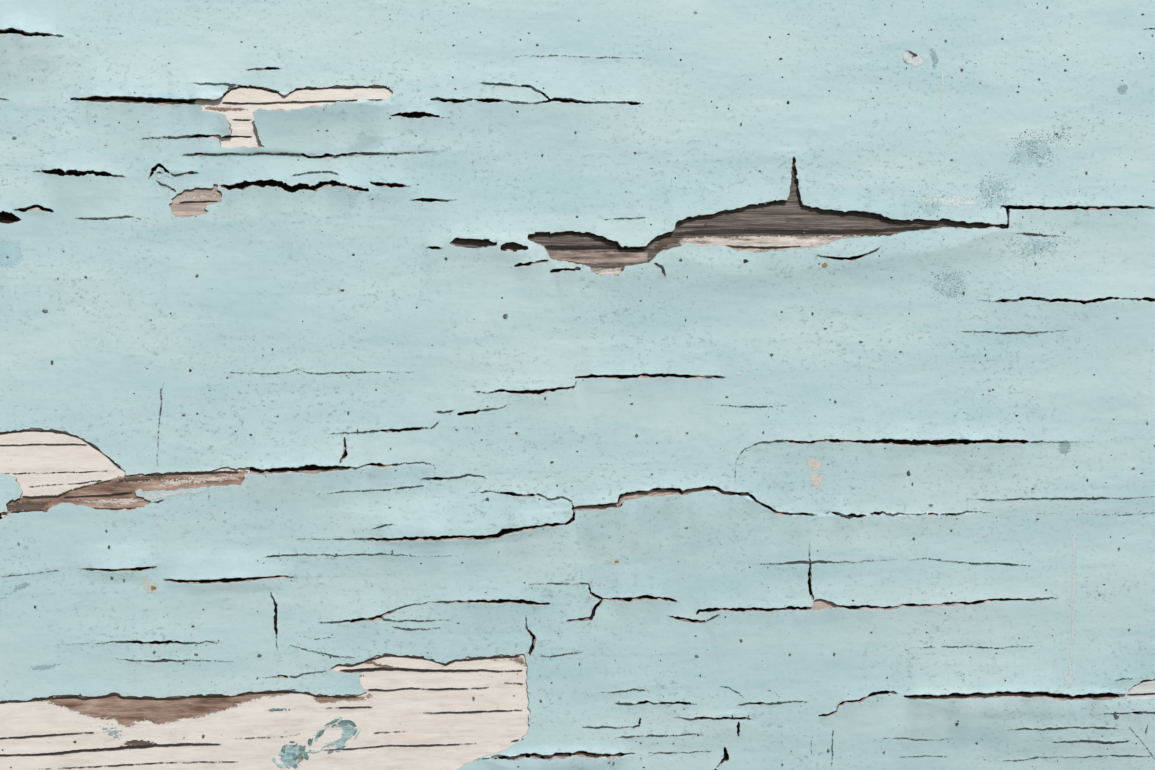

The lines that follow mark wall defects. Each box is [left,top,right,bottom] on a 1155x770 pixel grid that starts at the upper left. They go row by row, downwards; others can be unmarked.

peeling [195,85,393,149]
crack [391,55,645,118]
crack [0,205,140,224]
peeling [156,171,226,217]
peeling [451,158,1008,275]
crack [1001,205,1155,237]
crack [982,296,1155,304]
peeling [0,428,250,518]
crack [7,374,1153,678]
peeling [0,654,531,770]
crack [482,678,1155,770]
peeling [1118,679,1155,700]